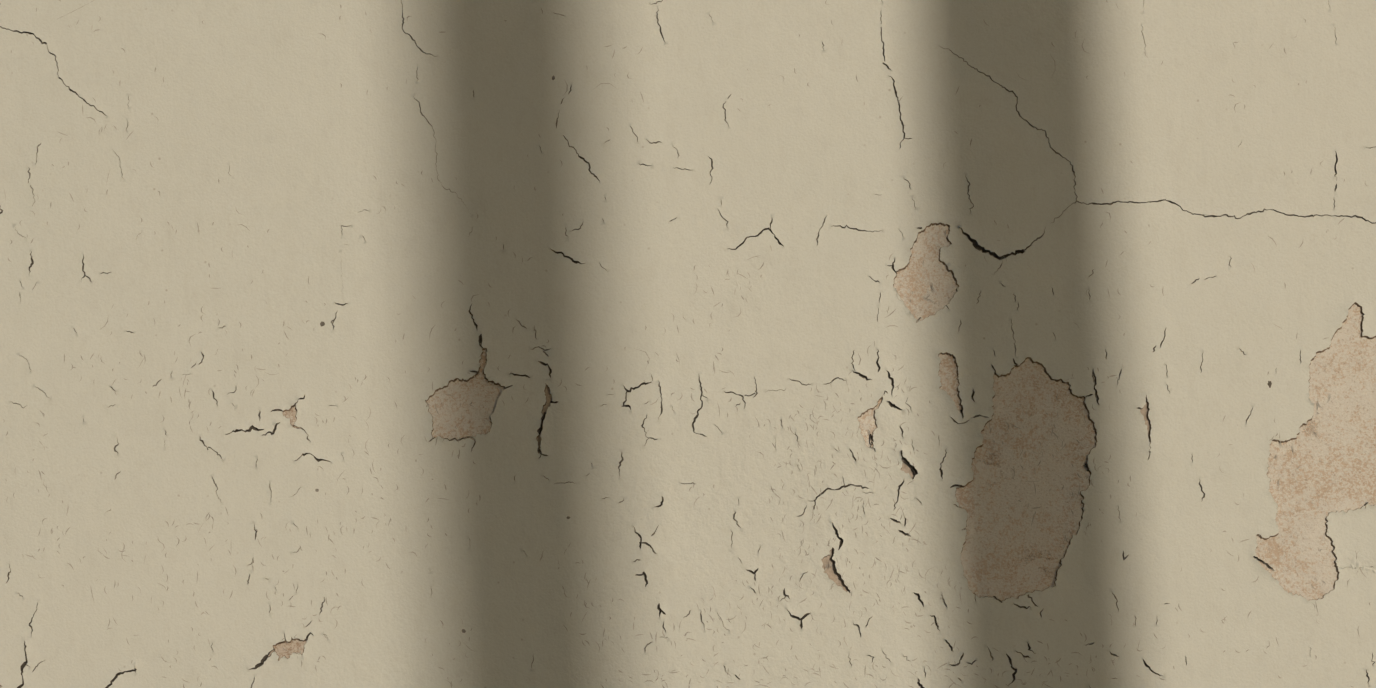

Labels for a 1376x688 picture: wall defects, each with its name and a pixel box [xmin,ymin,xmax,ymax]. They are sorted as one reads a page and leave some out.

crack [153,326,344,636]
peeling [425,304,513,451]
crack [540,86,783,271]
crack [510,276,989,651]
crack [816,0,916,245]
peeling [887,223,959,323]
peeling [950,357,1098,618]
crack [941,47,1376,356]
peeling [1253,302,1376,600]
crack [6,564,45,688]
peeling [249,632,314,670]
crack [848,593,1036,688]